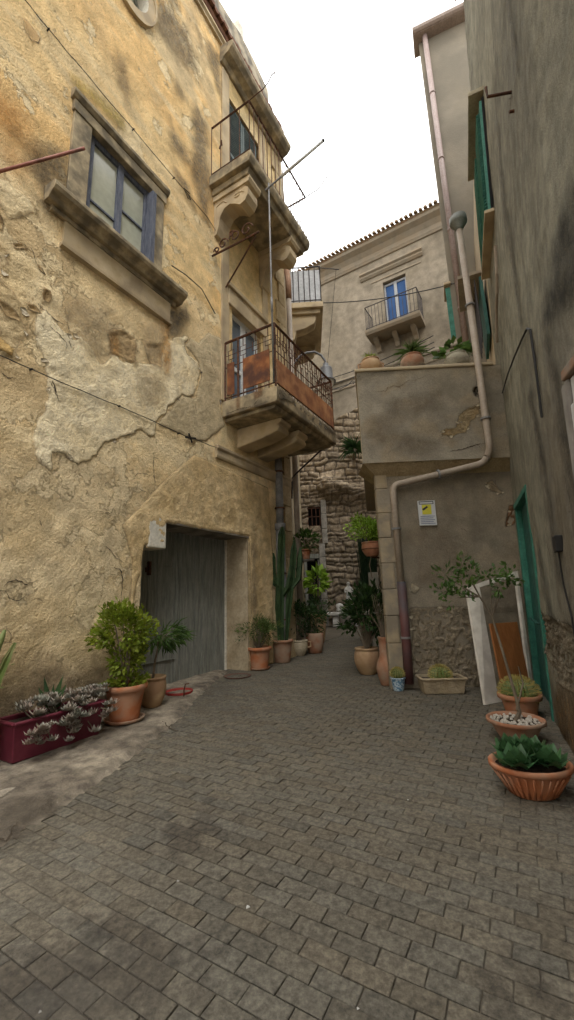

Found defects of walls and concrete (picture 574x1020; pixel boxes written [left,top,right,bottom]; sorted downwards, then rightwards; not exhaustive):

peeling [0,179,35,230]
peeling [0,243,202,470]
spalling [441,386,481,438]